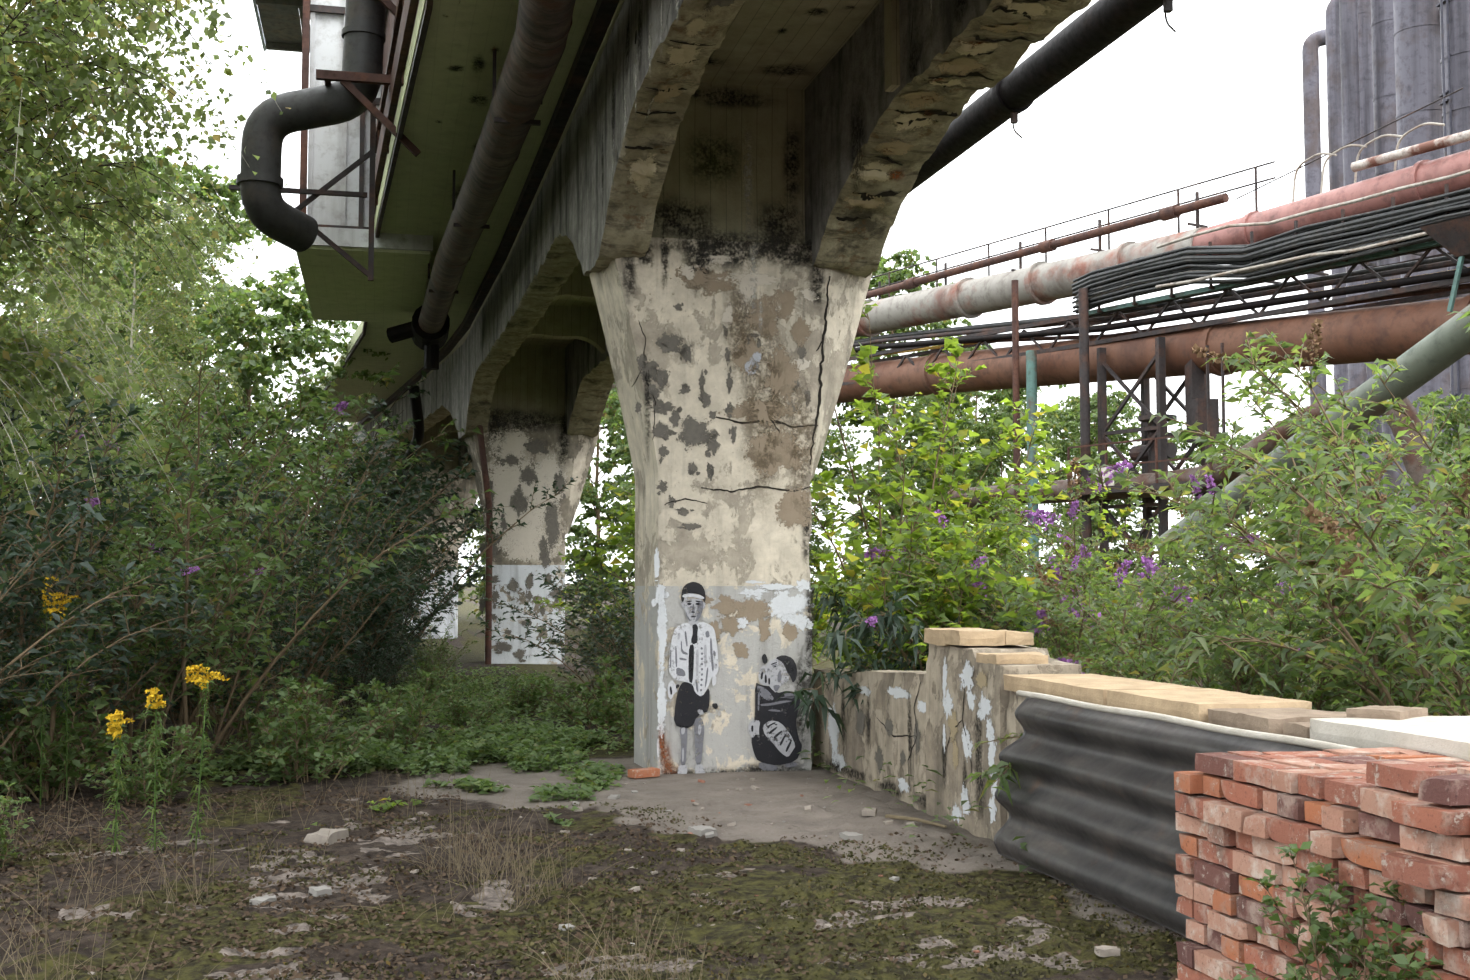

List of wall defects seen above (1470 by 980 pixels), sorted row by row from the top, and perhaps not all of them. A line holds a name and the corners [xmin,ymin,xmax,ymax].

spalling [842,0,1055,210]
peeling [670,266,739,311]
leakage [624,133,824,487]
peeling [635,285,814,531]
crack [665,276,830,505]
peeling [478,438,566,663]